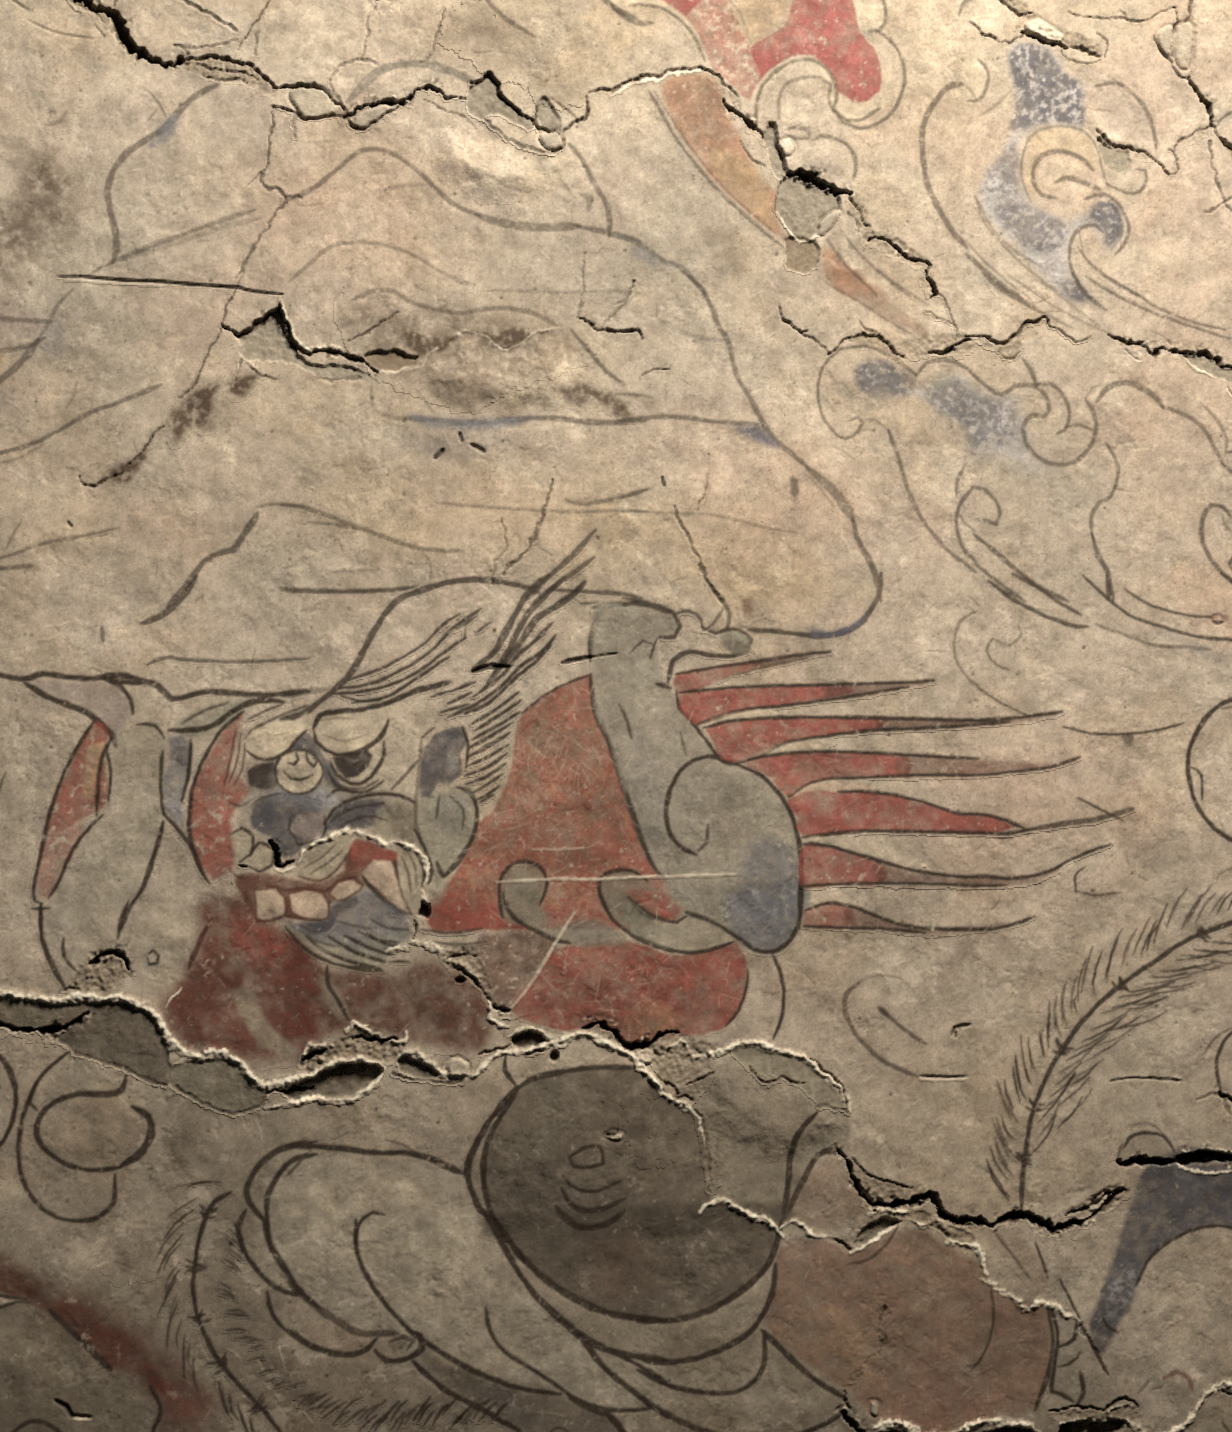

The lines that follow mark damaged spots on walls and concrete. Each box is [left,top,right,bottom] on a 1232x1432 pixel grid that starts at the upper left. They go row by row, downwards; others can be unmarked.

crack [967,0,1232,215]
crack [63,0,480,439]
crack [576,65,1232,398]
crack [77,475,104,489]
spalling [282,1018,409,1106]
crack [0,826,1132,1378]
crack [1196,1087,1232,1119]
spalling [1108,1140,1232,1176]
crack [839,1304,892,1394]
spalling [831,1388,1143,1432]
crack [1114,1379,1232,1432]